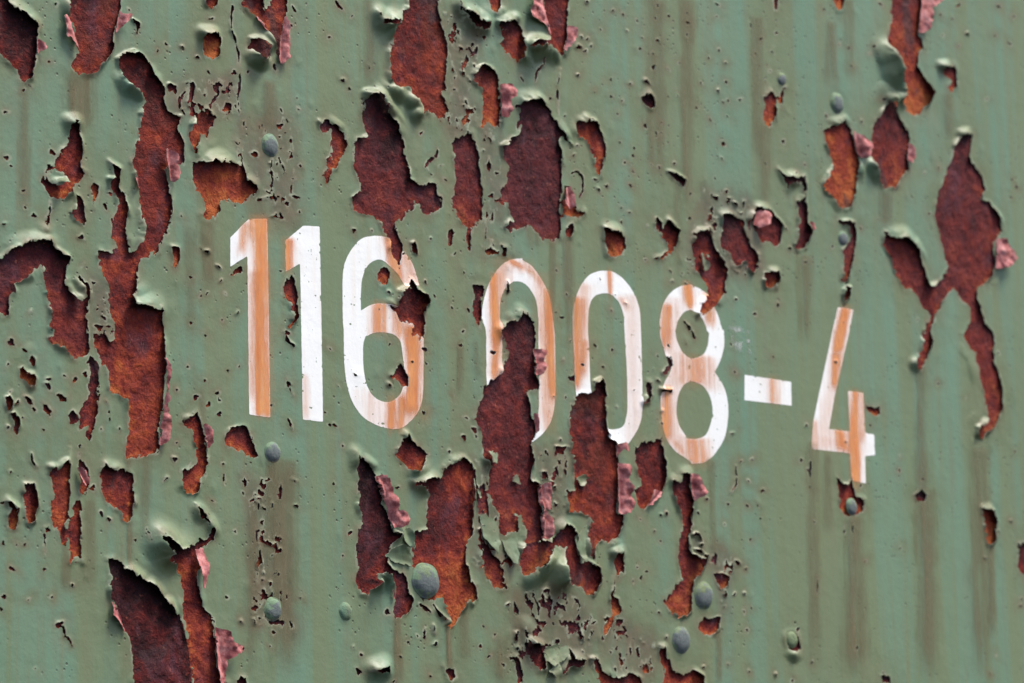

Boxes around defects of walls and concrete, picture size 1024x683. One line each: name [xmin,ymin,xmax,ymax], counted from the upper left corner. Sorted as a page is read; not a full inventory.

peeling [320,0,606,352]
peeling [823,0,943,302]
peeling [0,0,301,683]
rust [241,219,270,416]
rust [373,304,427,429]
rust [490,274,501,376]
peeling [348,312,740,683]
rust [545,291,566,399]
rust [684,283,708,308]
rust [832,308,850,386]
rust [835,392,871,482]
peeling [883,133,1018,439]